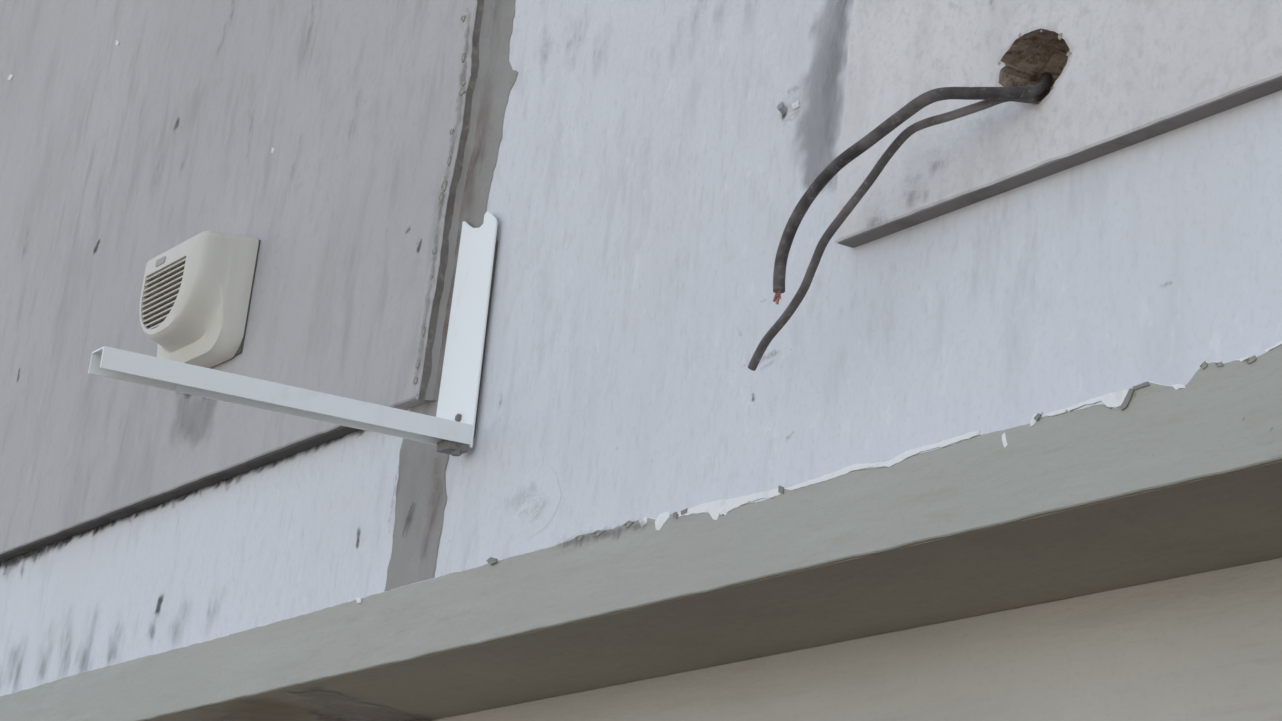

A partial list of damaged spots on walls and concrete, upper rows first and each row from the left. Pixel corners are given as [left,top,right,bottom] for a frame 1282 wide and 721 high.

leakage [802,0,845,186]
spalling [1030,382,1150,427]
peeling [575,430,981,541]